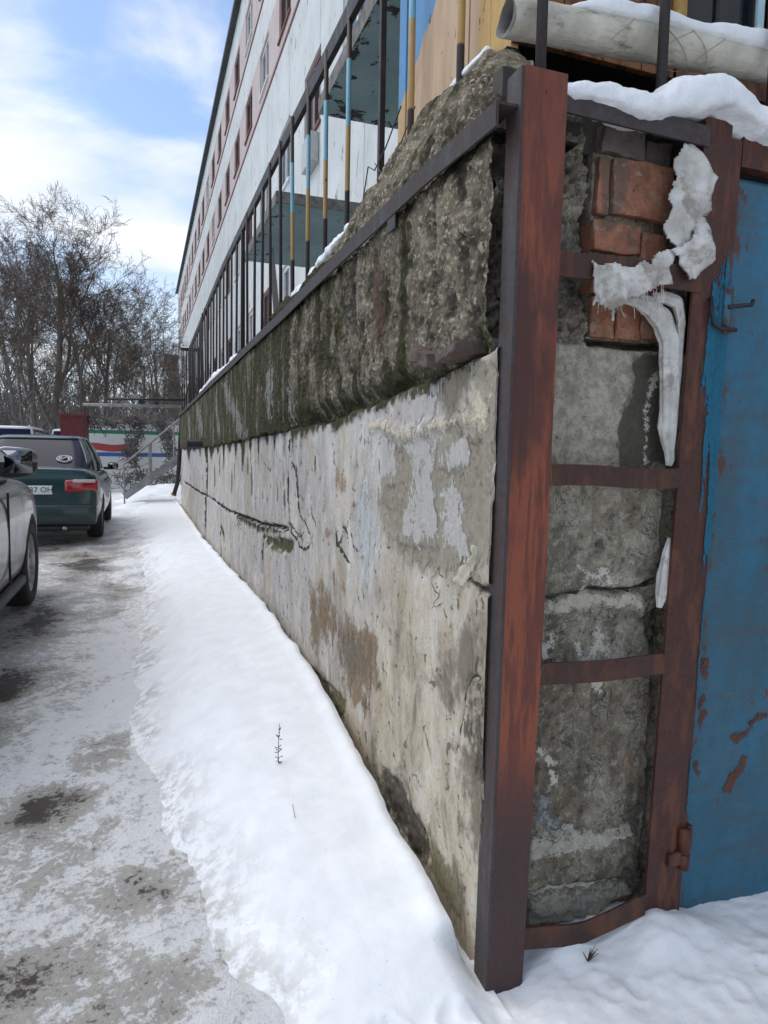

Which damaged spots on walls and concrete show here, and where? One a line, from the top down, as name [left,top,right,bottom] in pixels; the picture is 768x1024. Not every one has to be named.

leakage [188,402,203,439]
leakage [214,376,250,440]
leakage [265,367,273,418]
spalling [214,454,263,499]
crack [185,438,362,566]
peeling [378,358,497,597]
leakage [314,667,346,720]
corrosion [698,694,707,730]
corrosion [722,755,748,795]
leakage [378,768,464,918]